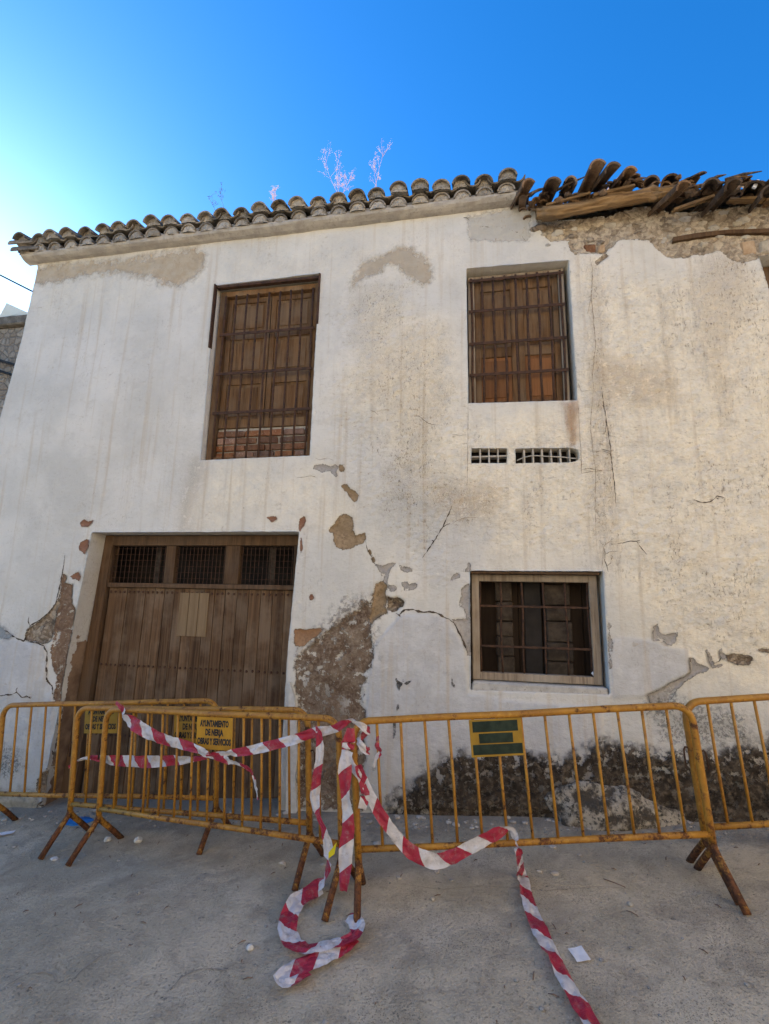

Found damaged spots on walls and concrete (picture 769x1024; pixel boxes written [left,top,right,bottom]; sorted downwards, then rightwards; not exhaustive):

spalling [467,205,769,265]
crack [578,257,645,570]
flaking render [313,464,359,502]
flaking render [79,519,93,554]
crack [422,506,478,558]
crack [0,556,65,766]
spalling [24,572,81,701]
spalling [286,514,417,813]
crack [396,609,466,648]
flaking render [647,648,769,714]
leakage [386,738,699,822]
leakage [702,739,769,822]